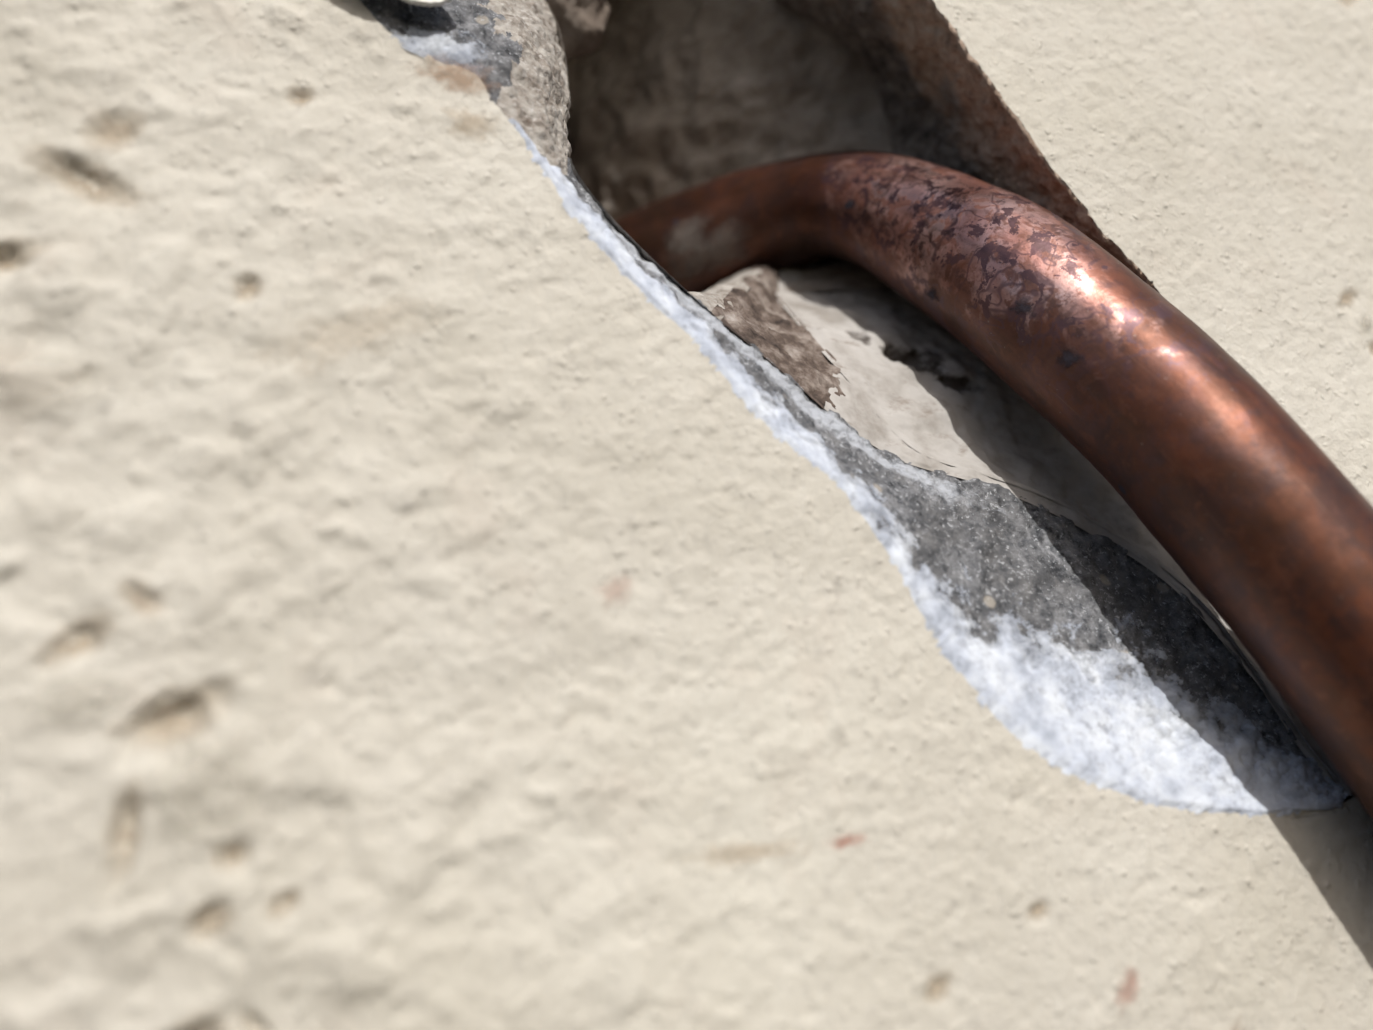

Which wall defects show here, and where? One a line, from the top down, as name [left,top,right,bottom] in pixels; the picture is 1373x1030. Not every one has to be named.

spalling [360,0,1350,818]